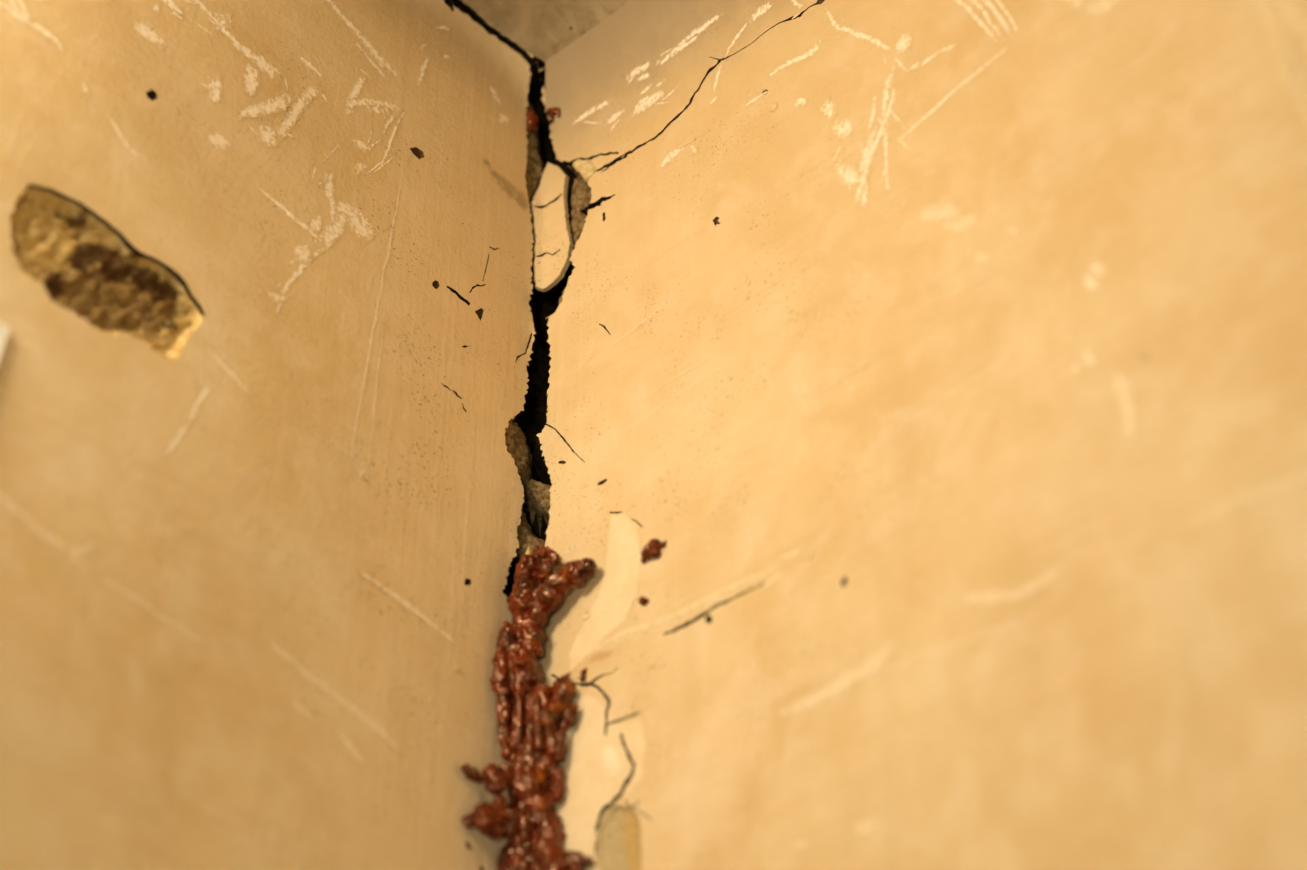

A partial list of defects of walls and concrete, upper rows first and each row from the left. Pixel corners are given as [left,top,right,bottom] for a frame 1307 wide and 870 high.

flaking render [10,184,204,360]
crack [444,0,816,598]
crack [551,667,652,858]
flaking render [596,804,643,870]